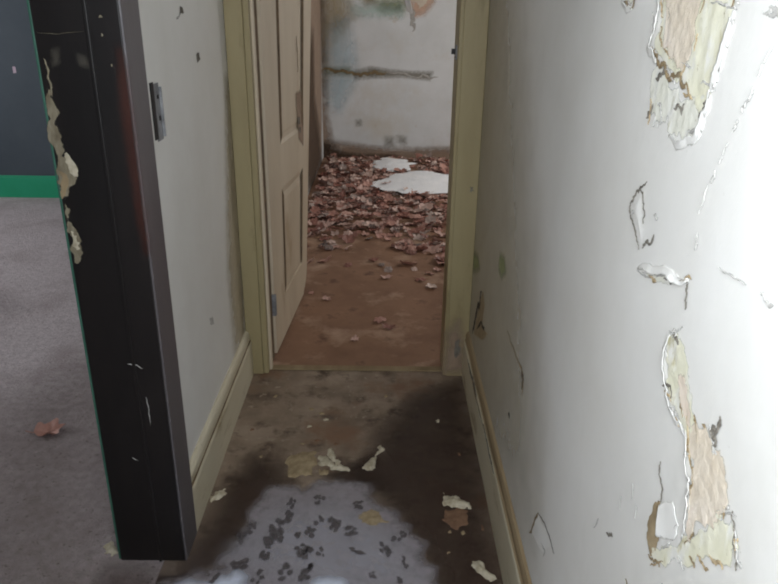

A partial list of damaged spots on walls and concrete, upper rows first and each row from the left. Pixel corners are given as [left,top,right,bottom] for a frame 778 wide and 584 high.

peeling [43,58,83,264]
peeling [646,0,740,150]
peeling [638,263,691,310]
water stain [188,460,284,576]
water stain [331,385,497,584]
spalling [647,327,739,571]